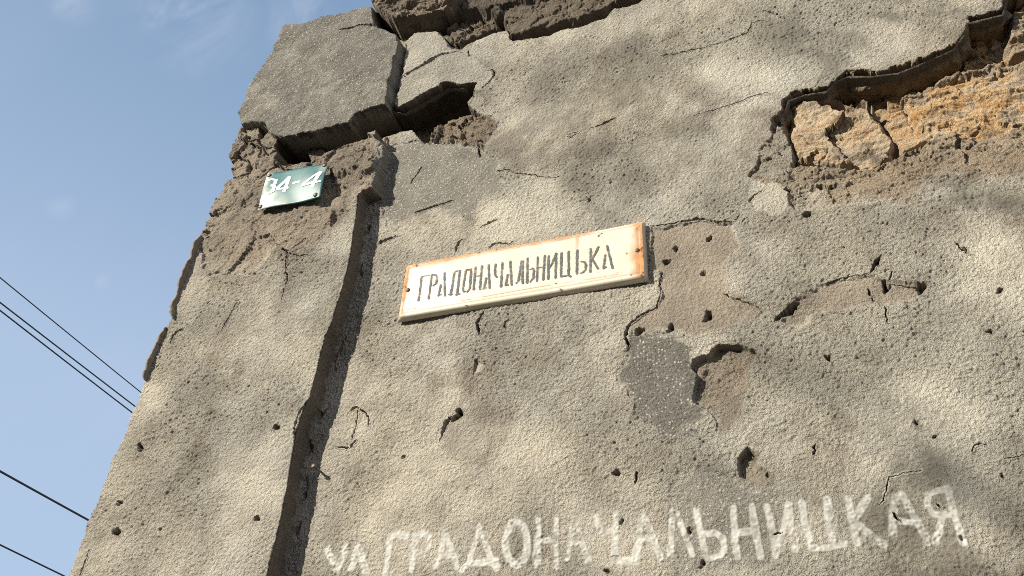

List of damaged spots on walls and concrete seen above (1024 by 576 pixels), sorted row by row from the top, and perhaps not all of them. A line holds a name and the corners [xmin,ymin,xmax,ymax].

crack [338,22,380,30]
crack [403,50,496,89]
spalling [745,0,1024,217]
crack [240,136,294,170]
crack [279,237,309,302]
spalling [142,81,504,576]
crack [622,272,665,347]
spalling [614,220,761,442]
crack [828,254,919,324]